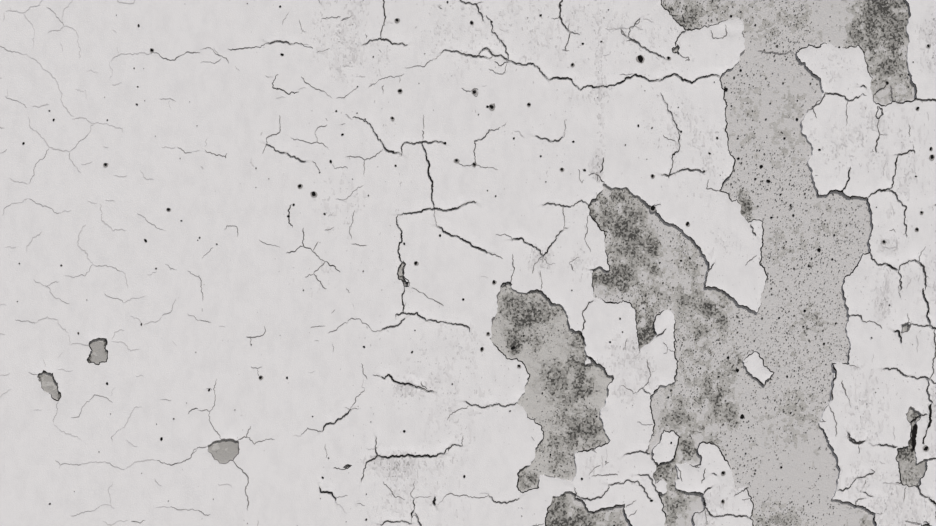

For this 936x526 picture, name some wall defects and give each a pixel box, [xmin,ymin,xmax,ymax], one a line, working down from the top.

spalling [588,0,917,526]
crack [812,84,936,526]
spalling [37,370,61,401]
spalling [87,338,108,365]
spalling [208,438,240,464]
crack [37,363,519,526]
spalling [490,282,632,526]
crack [574,450,661,516]
crack [675,464,750,525]
spalling [896,406,928,487]